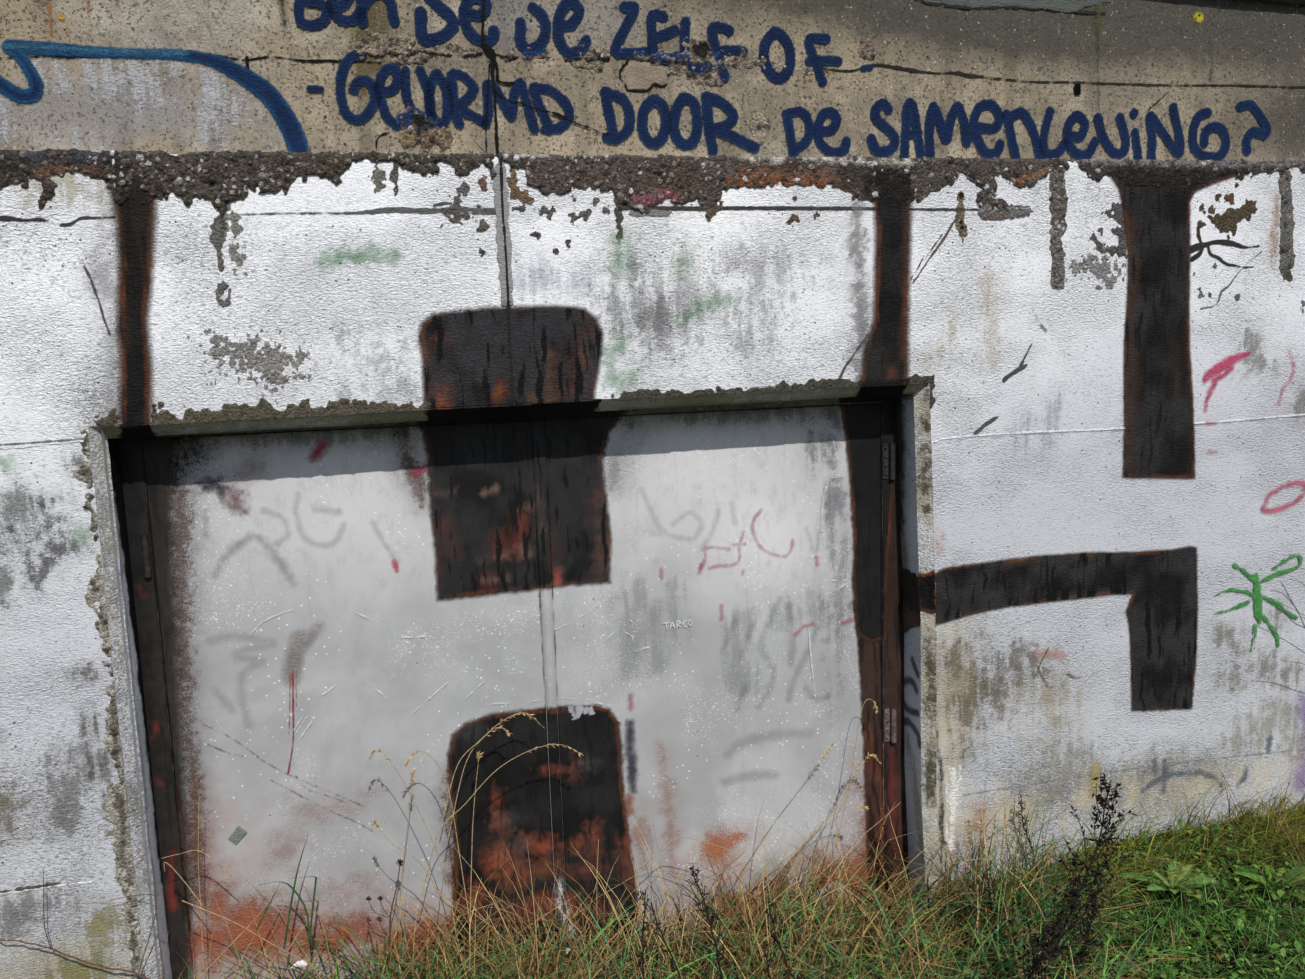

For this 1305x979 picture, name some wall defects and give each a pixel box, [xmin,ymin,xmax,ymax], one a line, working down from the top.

crack [219,55,382,69]
crack [481,0,610,154]
crack [619,60,668,92]
crack [822,63,1305,110]
spalling [0,103,1305,289]
spalling [149,328,431,425]
damp [915,389,933,513]
damp [0,491,79,609]
spalling [74,408,145,979]
damp [906,629,1050,906]
corrosion [186,776,453,975]
corrosion [672,785,885,940]